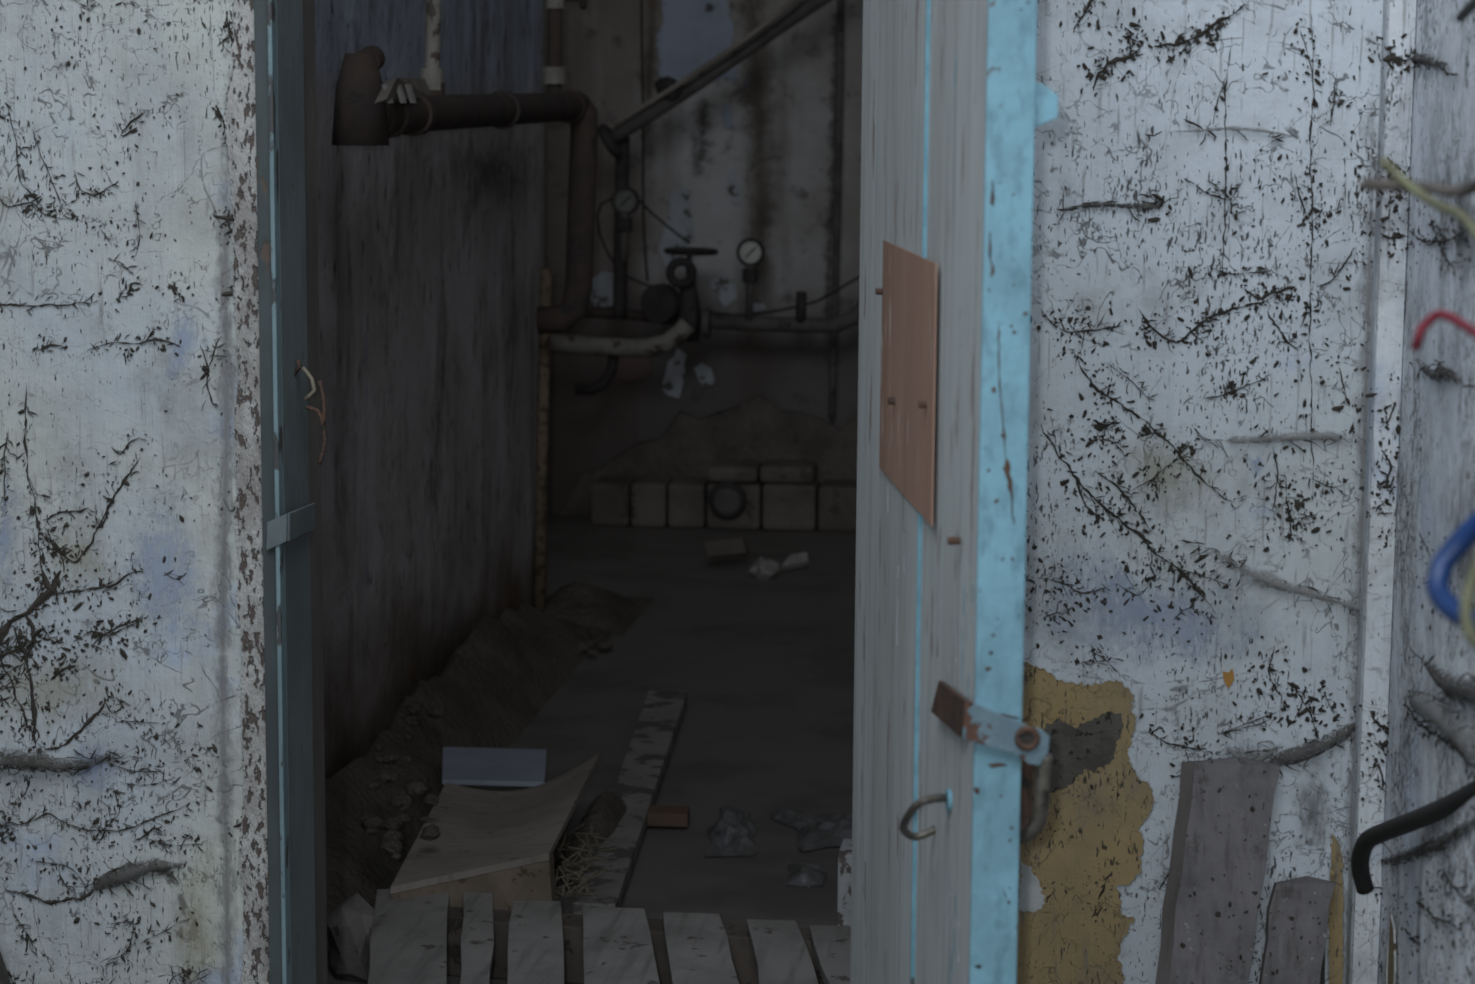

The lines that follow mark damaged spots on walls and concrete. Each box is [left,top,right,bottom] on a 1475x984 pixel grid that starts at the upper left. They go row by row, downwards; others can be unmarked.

peeling [987,311,1028,523]
peeling [988,648,1155,984]